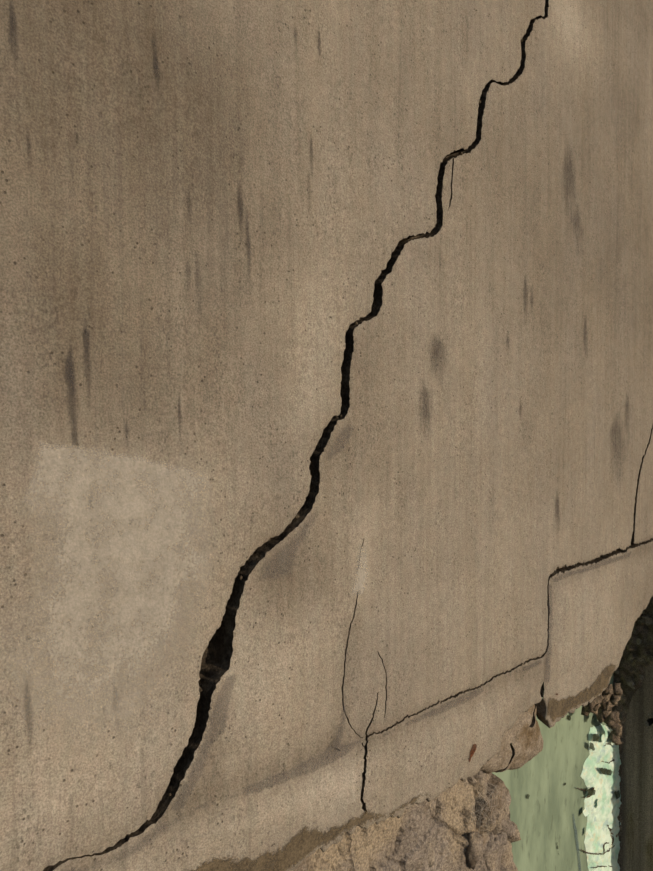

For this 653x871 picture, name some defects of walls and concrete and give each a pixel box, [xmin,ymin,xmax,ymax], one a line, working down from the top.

crack [43,0,549,871]
water stain [190,794,431,871]
spalling [291,704,544,871]
crack [341,425,653,814]
peeling [578,596,653,871]